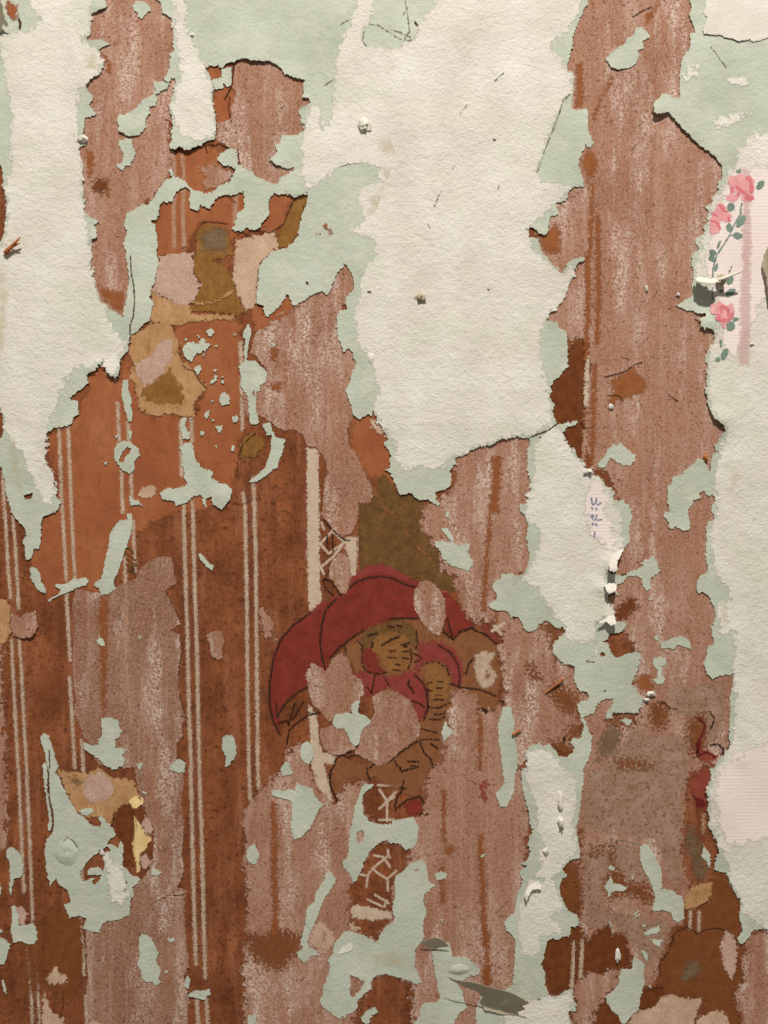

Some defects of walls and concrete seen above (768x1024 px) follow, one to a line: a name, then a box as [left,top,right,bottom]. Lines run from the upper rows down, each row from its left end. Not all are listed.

peeling [606,27,650,70]
peeling [0,0,594,560]
peeling [94,496,142,595]
peeling [652,0,768,944]
peeling [0,847,38,965]
peeling [40,717,162,932]
peeling [271,741,323,839]
peeling [332,700,371,746]
peeling [297,783,447,1024]
peeling [414,942,480,1024]
peeling [475,420,660,1024]
peeling [605,844,685,1024]